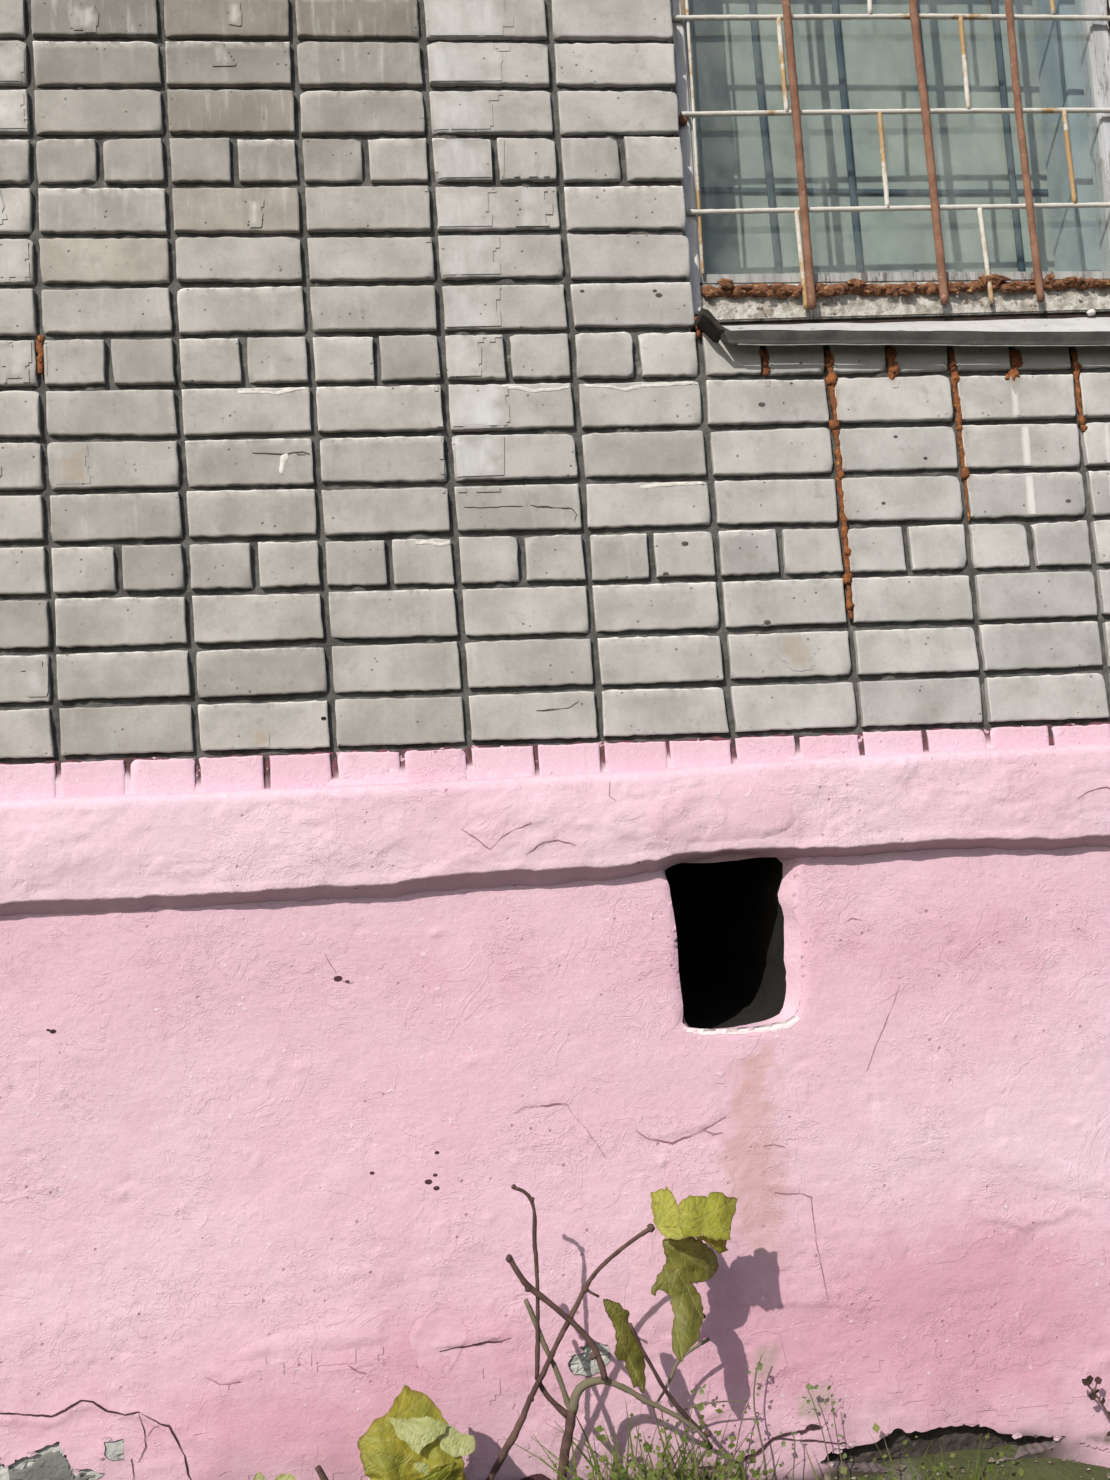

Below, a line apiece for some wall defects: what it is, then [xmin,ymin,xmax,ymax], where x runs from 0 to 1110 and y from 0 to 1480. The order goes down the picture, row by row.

rust [36,335,47,375]
rust [885,347,900,388]
rust [1004,350,1023,395]
rust [1070,351,1090,442]
rust [946,350,976,529]
rust [822,349,858,621]
flaking render [0,1436,124,1480]
crack [0,1400,191,1480]